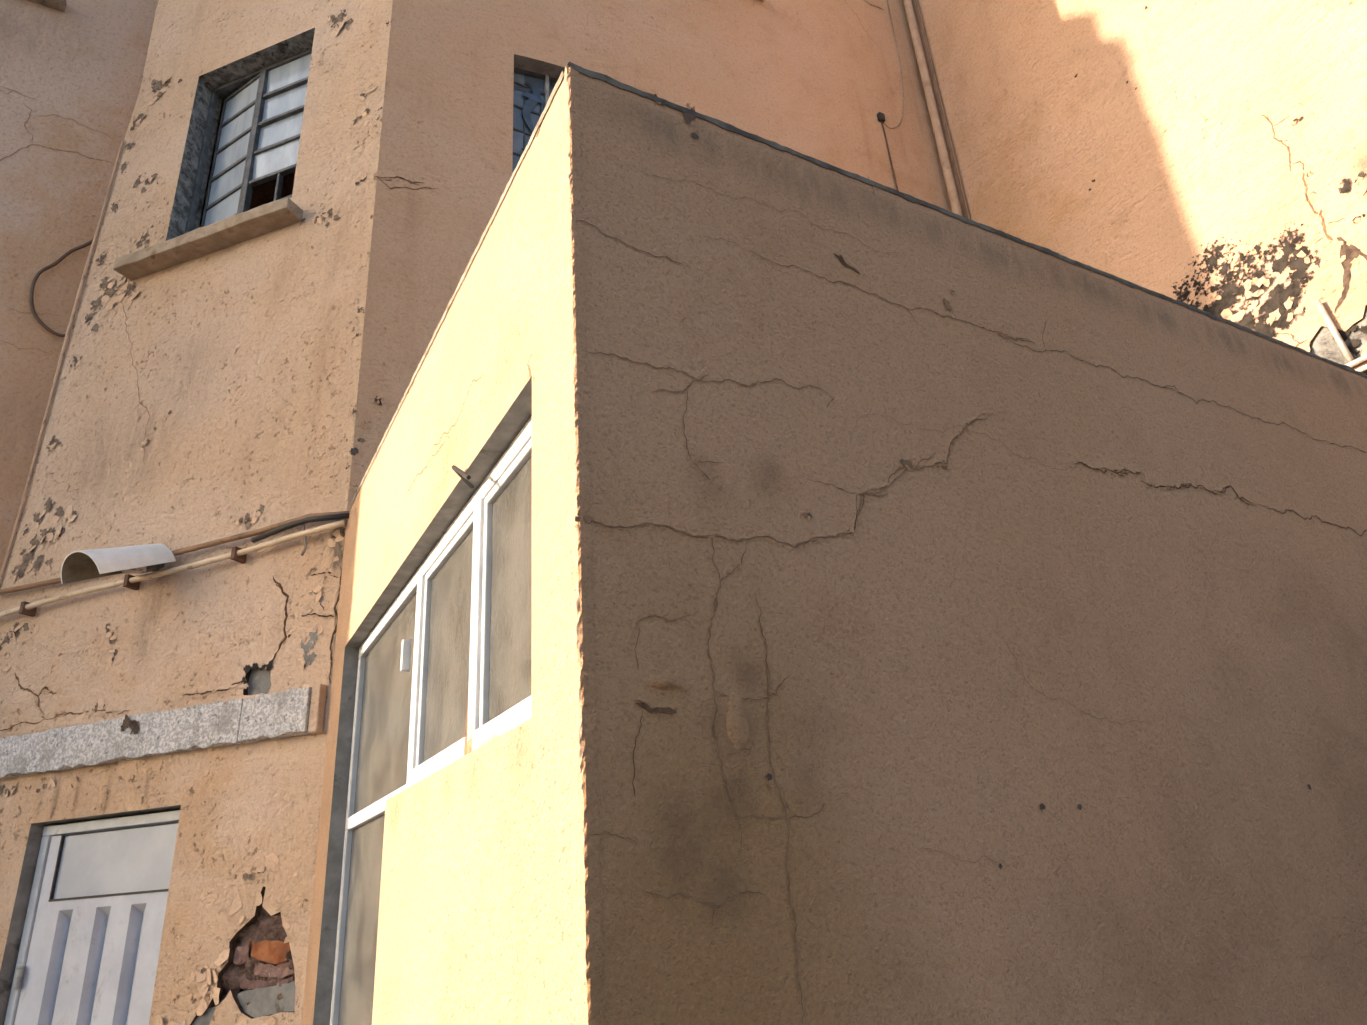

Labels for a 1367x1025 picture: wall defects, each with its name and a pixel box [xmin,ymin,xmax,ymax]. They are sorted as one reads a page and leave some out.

crack [0,86,113,163]
crack [1262,115,1345,244]
peeling [1338,168,1367,195]
crack [704,236,1367,453]
peeling [1171,214,1367,375]
crack [584,350,834,479]
peeling [10,497,77,582]
crack [0,670,130,731]
flaking render [241,660,273,695]
peeling [301,623,324,671]
crack [591,410,1366,1025]
flaking render [155,852,295,1025]